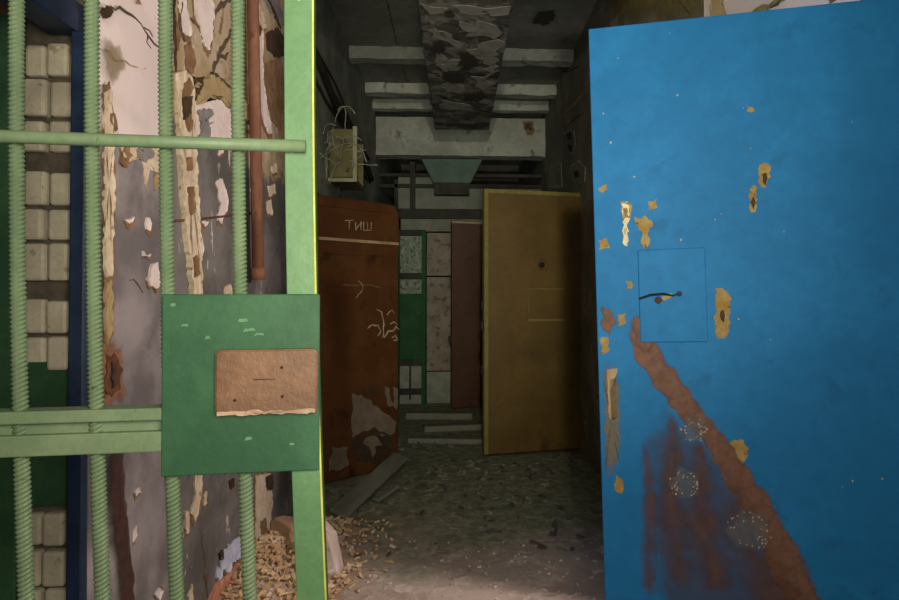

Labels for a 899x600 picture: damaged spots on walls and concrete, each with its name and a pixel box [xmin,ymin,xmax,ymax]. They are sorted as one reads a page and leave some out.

crack [110,0,181,71]
peeling [172,0,232,138]
spalling [259,0,284,139]
crack [752,0,785,12]
peeling [101,146,161,350]
peeling [176,149,229,294]
spalling [619,200,658,249]
spalling [748,163,771,213]
corrosion [601,307,616,334]
spalling [714,288,732,338]
corrosion [102,344,125,406]
corrosion [630,316,820,600]